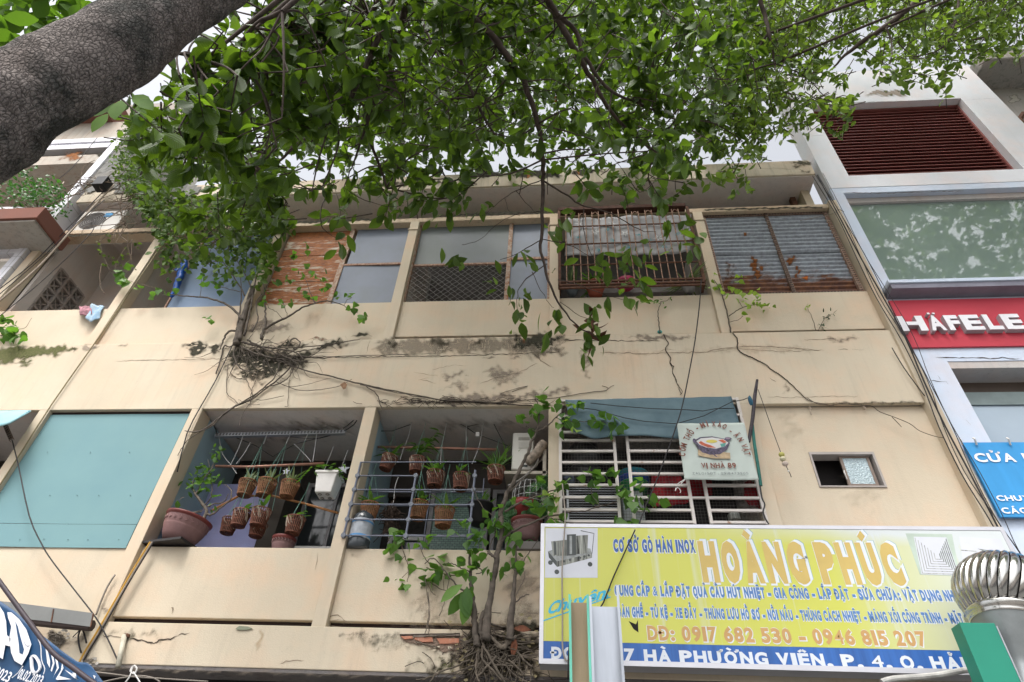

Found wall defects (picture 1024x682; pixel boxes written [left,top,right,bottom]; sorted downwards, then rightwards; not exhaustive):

rust [750,256,763,279]
leakage [377,333,568,405]
crack [310,338,857,384]
crack [103,607,188,644]